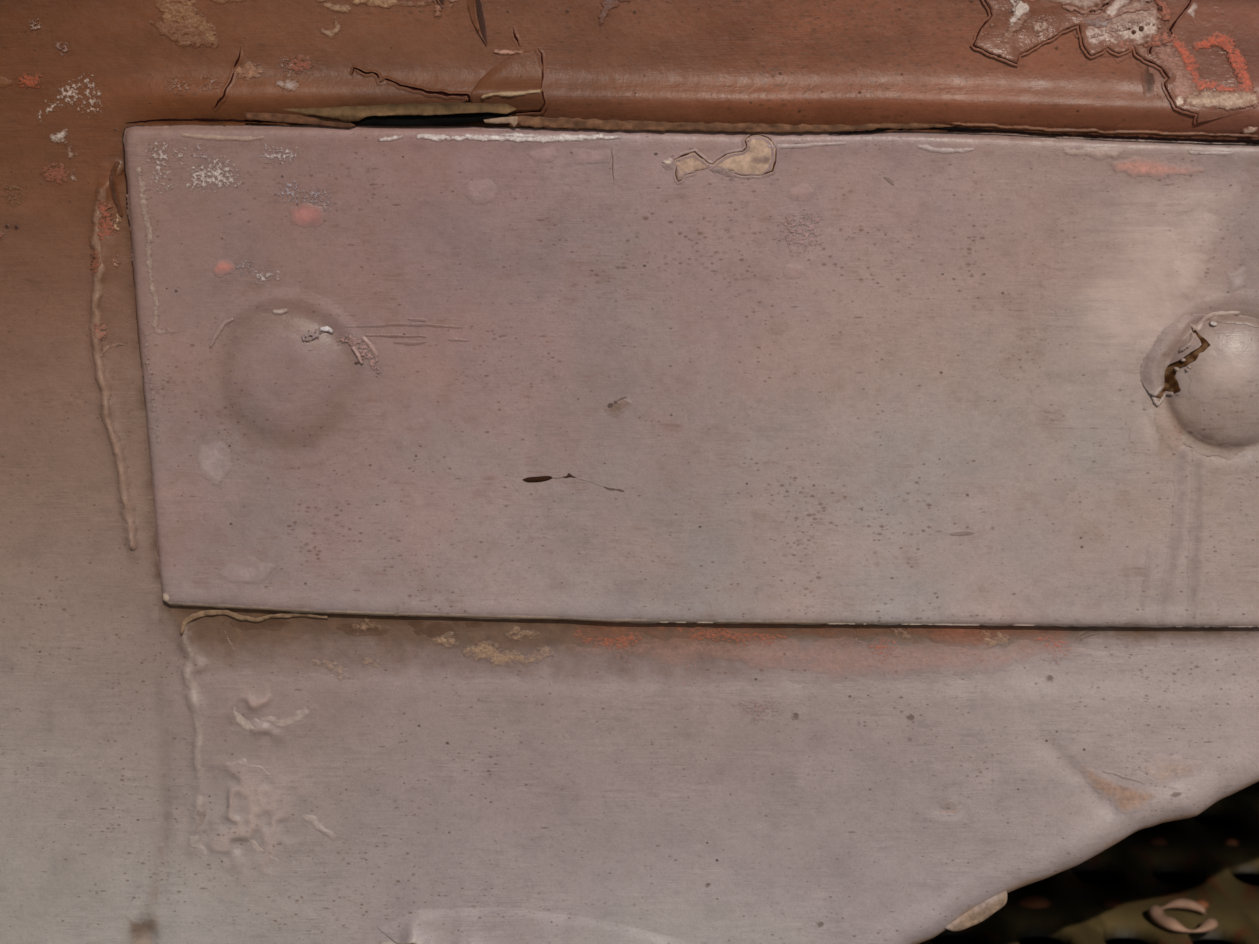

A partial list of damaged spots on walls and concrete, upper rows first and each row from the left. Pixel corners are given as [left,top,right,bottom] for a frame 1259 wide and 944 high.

crack [437,0,523,49]
crack [126,47,293,124]
spalling [165,54,315,96]
crack [349,65,471,103]
peeling [245,47,955,185]
crack [830,122,1259,144]
peeling [970,0,1259,124]
peeling [145,133,333,228]
peeling [1020,176,1259,455]
corrosion [555,621,1093,684]
peeling [377,907,690,944]